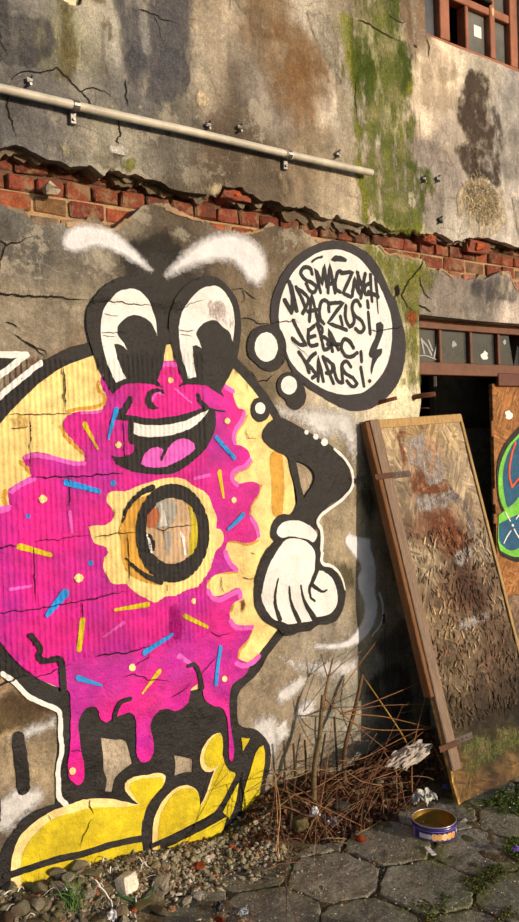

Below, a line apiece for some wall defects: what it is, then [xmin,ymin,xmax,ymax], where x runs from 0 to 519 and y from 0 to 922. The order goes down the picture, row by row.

damp [0,0,78,78]
crack [0,32,129,145]
spalling [109,143,129,159]
damp [115,0,191,103]
damp [457,69,502,187]
crack [0,236,34,268]
flaking render [0,148,519,292]
crack [0,293,147,337]
crack [5,322,126,505]